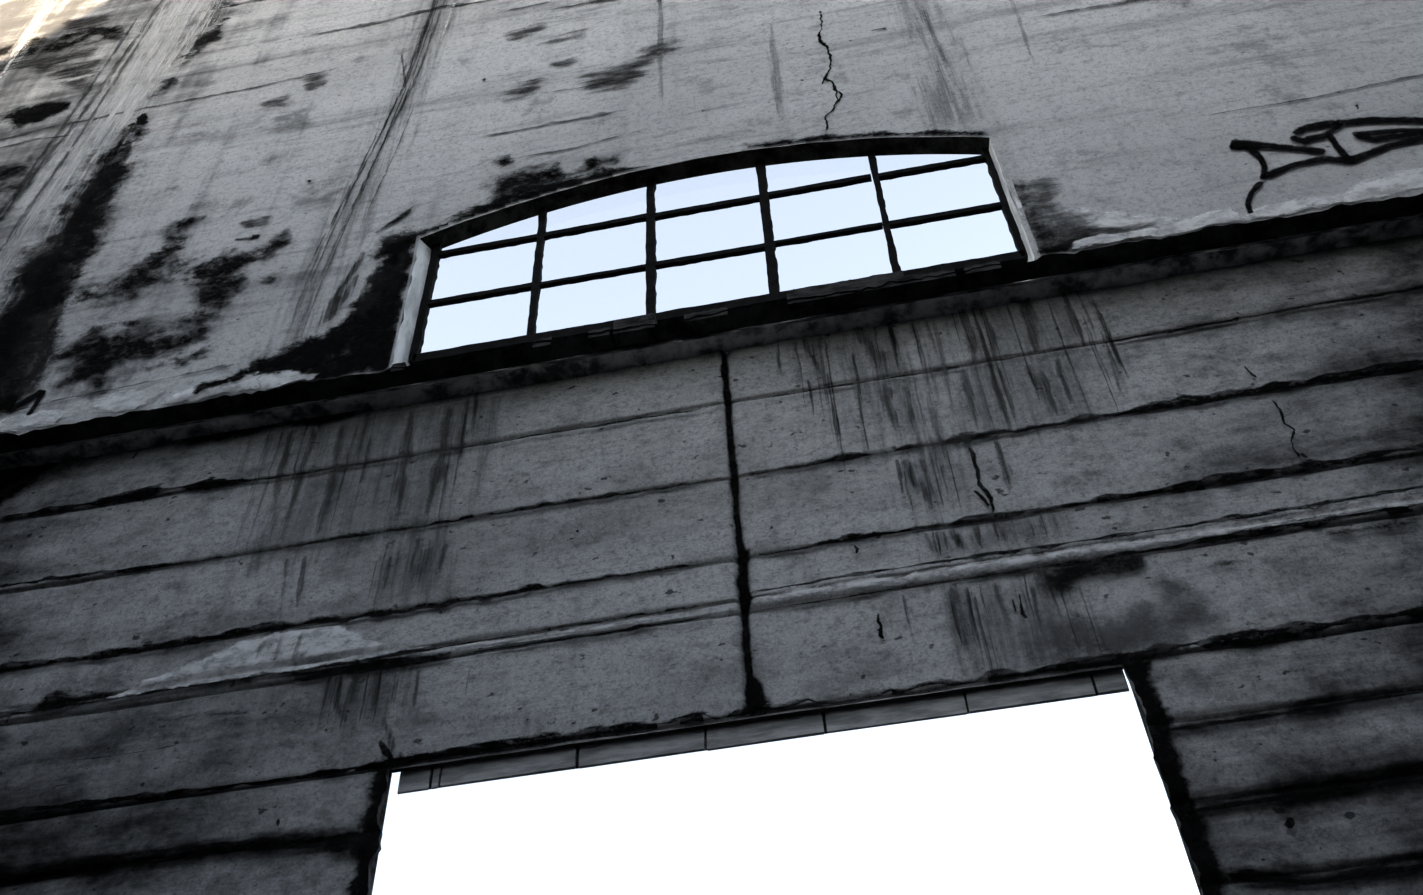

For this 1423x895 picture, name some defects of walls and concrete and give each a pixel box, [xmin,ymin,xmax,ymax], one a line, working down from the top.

water stain [0,0,291,412]
crack [817,11,843,131]
crack [1211,74,1423,115]
water stain [0,393,708,606]
water stain [749,286,1423,509]
water stain [0,443,1423,895]